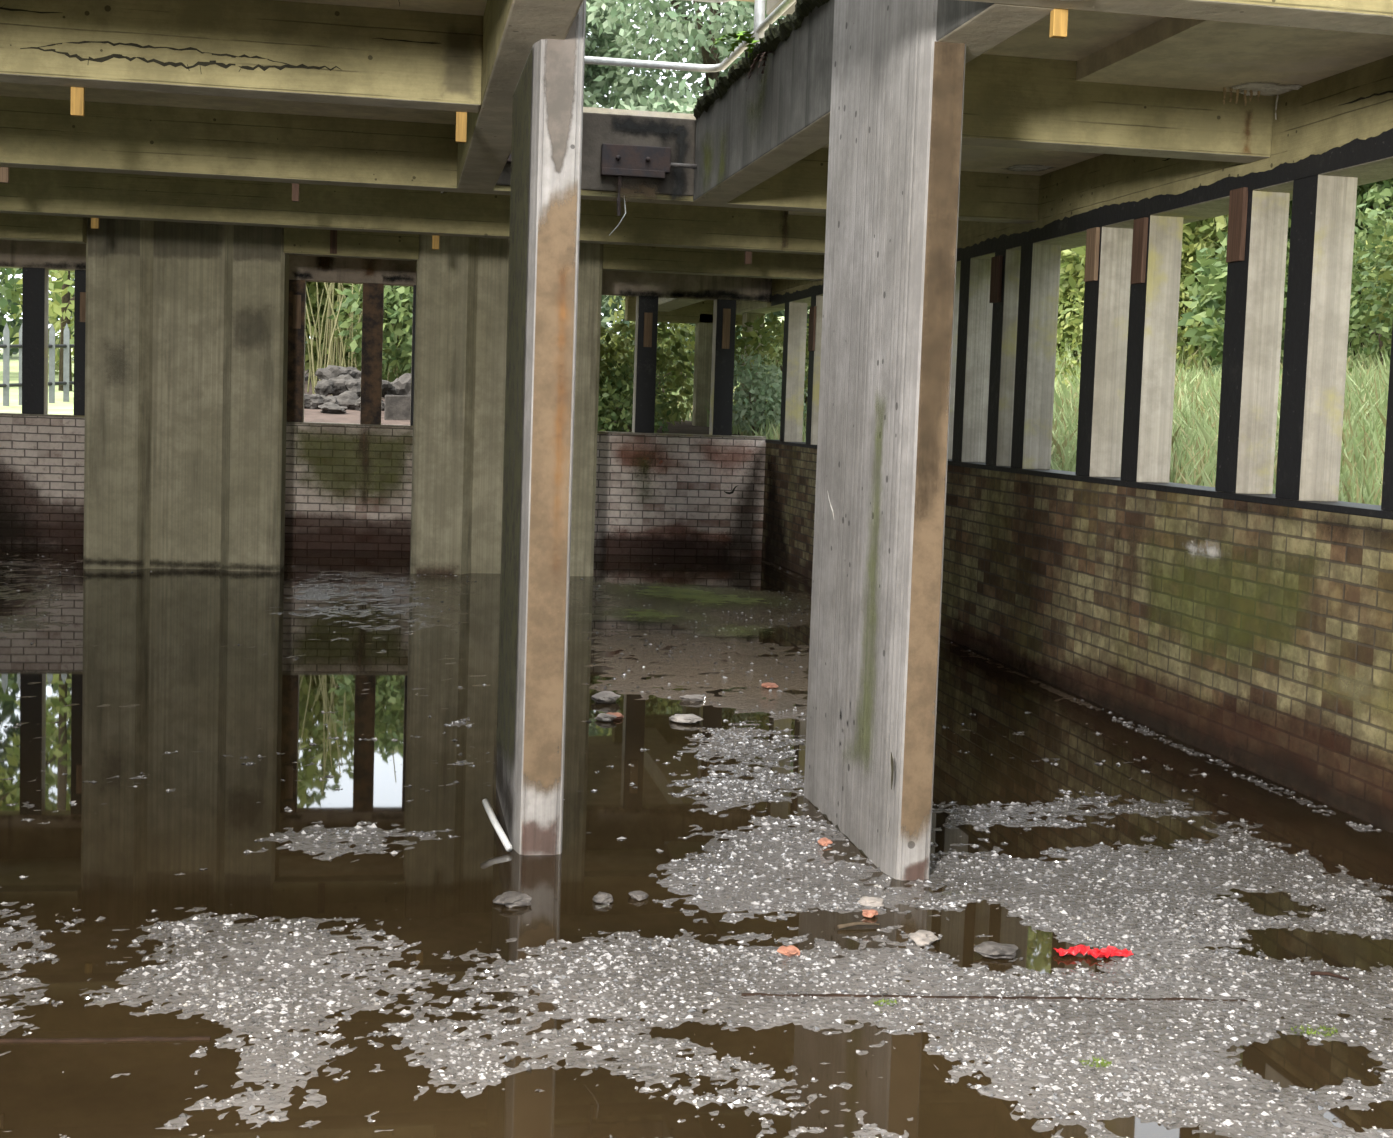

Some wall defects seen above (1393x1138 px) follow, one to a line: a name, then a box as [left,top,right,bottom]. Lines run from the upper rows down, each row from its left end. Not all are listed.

crack [0,6,341,71]
leakage [600,460,785,565]
leakage [955,620,1393,834]